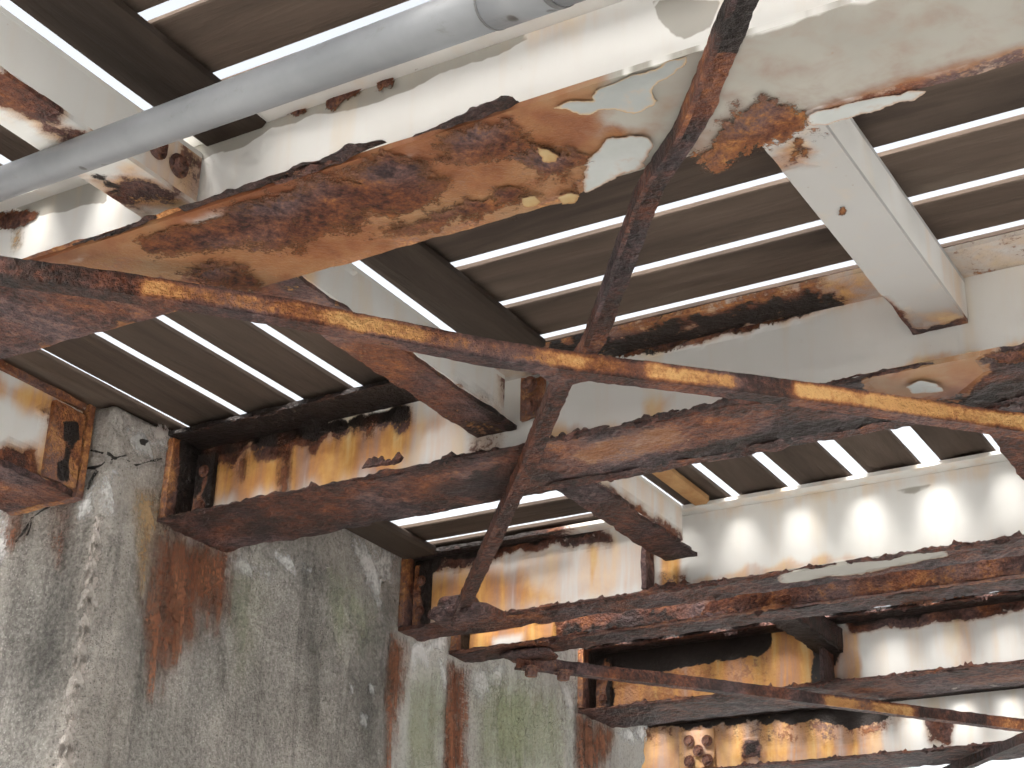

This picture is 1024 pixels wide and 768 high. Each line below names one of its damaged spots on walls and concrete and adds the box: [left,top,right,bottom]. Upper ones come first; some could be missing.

corrosion [326,89,361,112]
peeling [554,57,687,115]
corrosion [689,93,828,174]
peeling [537,147,559,163]
peeling [558,135,653,205]
corrosion [72,101,592,293]
peeling [820,368,909,386]
peeling [906,381,944,394]
corrosion [550,410,680,442]
crack [87,449,162,490]
corrosion [340,452,404,484]
corrosion [782,557,873,574]